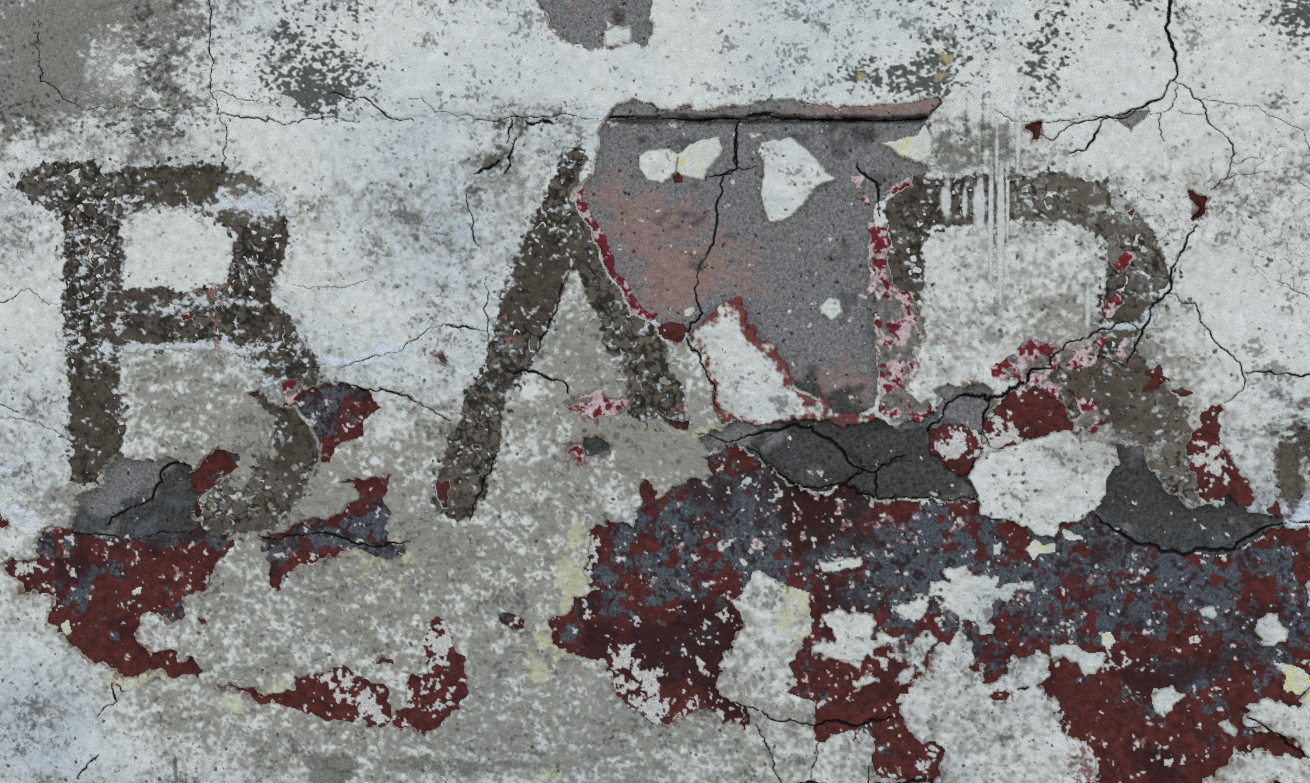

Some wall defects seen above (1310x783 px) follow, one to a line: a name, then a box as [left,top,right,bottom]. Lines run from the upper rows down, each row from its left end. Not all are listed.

spalling [536,0,653,49]
crack [1002,0,1310,190]
crack [2,0,973,504]
crack [927,226,1310,446]
peeling [282,379,380,462]
peeling [548,96,1310,783]
peeling [3,449,240,678]
peeling [261,475,406,591]
crack [1095,515,1310,556]
peeling [224,616,469,734]
crack [742,705,897,783]
crack [1247,717,1307,757]